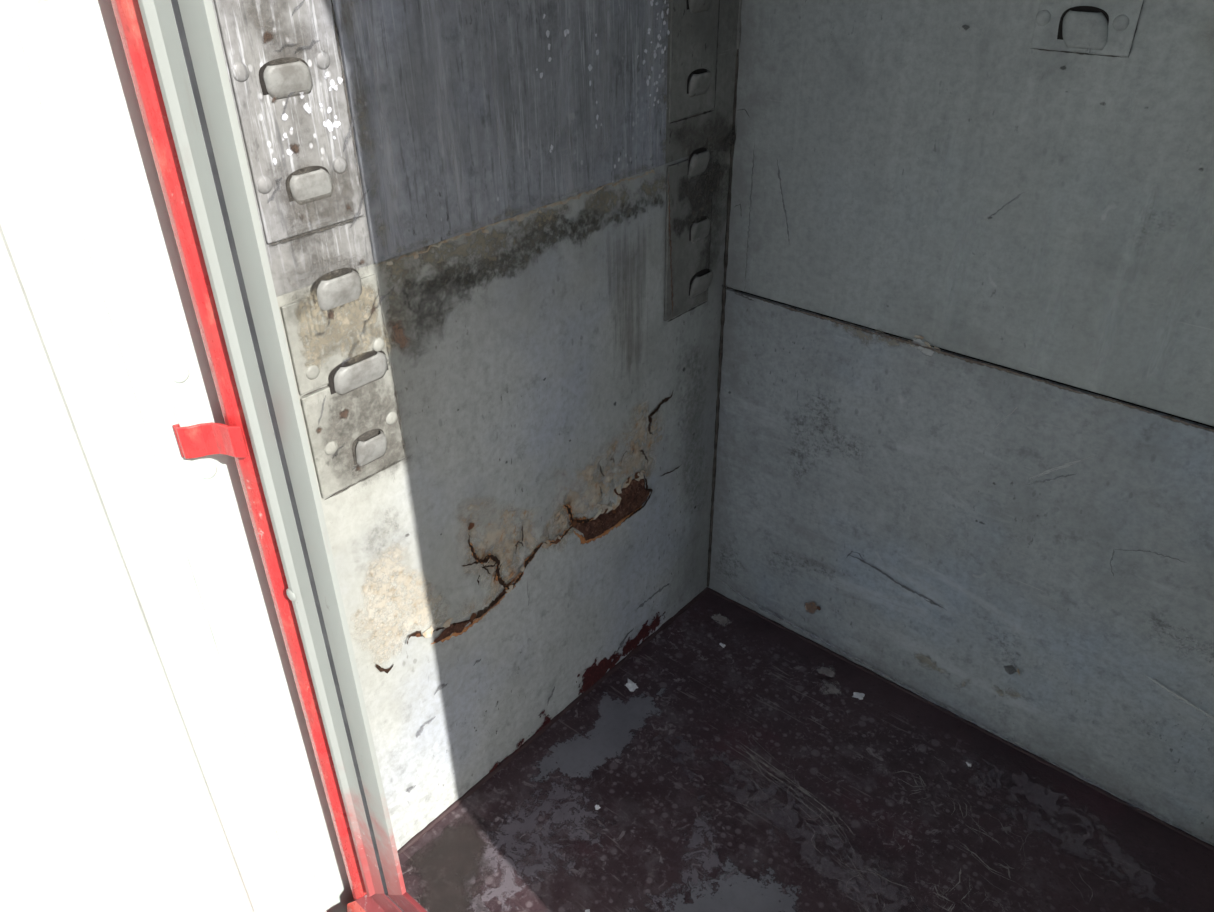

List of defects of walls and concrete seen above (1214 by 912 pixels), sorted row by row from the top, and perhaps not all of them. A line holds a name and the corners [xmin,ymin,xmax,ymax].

water stain [342,195,663,367]
spalling [569,470,653,544]
rust [469,511,534,602]
spalling [431,571,521,644]
water stain [407,817,489,912]